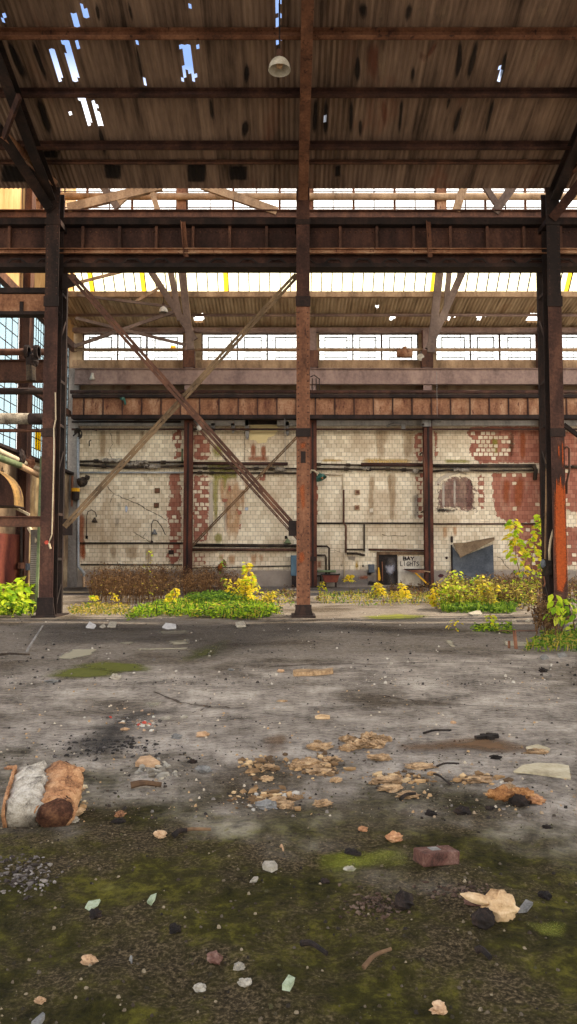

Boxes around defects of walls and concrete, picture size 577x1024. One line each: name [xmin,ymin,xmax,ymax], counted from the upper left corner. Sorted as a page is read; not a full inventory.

peeling [172,430,211,460]
crack [107,486,167,542]
peeling [166,474,210,566]
damp [209,478,227,542]
peeling [437,426,541,575]
corrosion [555,477,567,591]